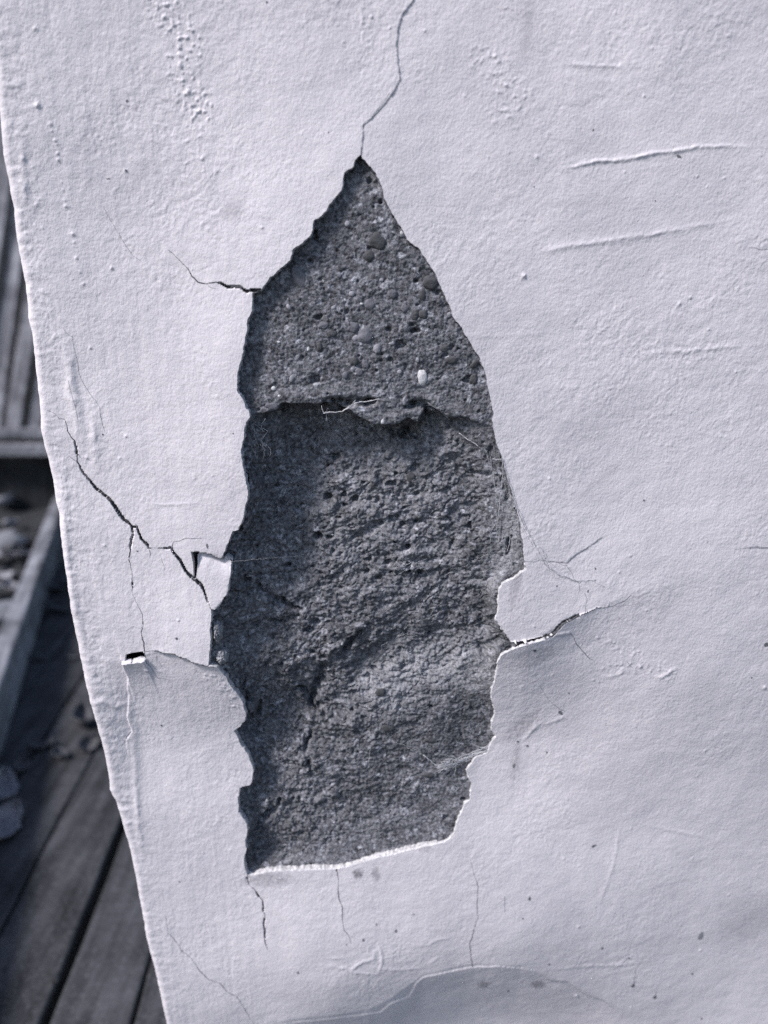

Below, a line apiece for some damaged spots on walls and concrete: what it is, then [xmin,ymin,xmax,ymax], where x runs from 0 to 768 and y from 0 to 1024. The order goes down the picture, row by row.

crack [168,250,261,293]
crack [50,331,210,680]
flaking render [191,155,553,876]
crack [527,538,634,661]